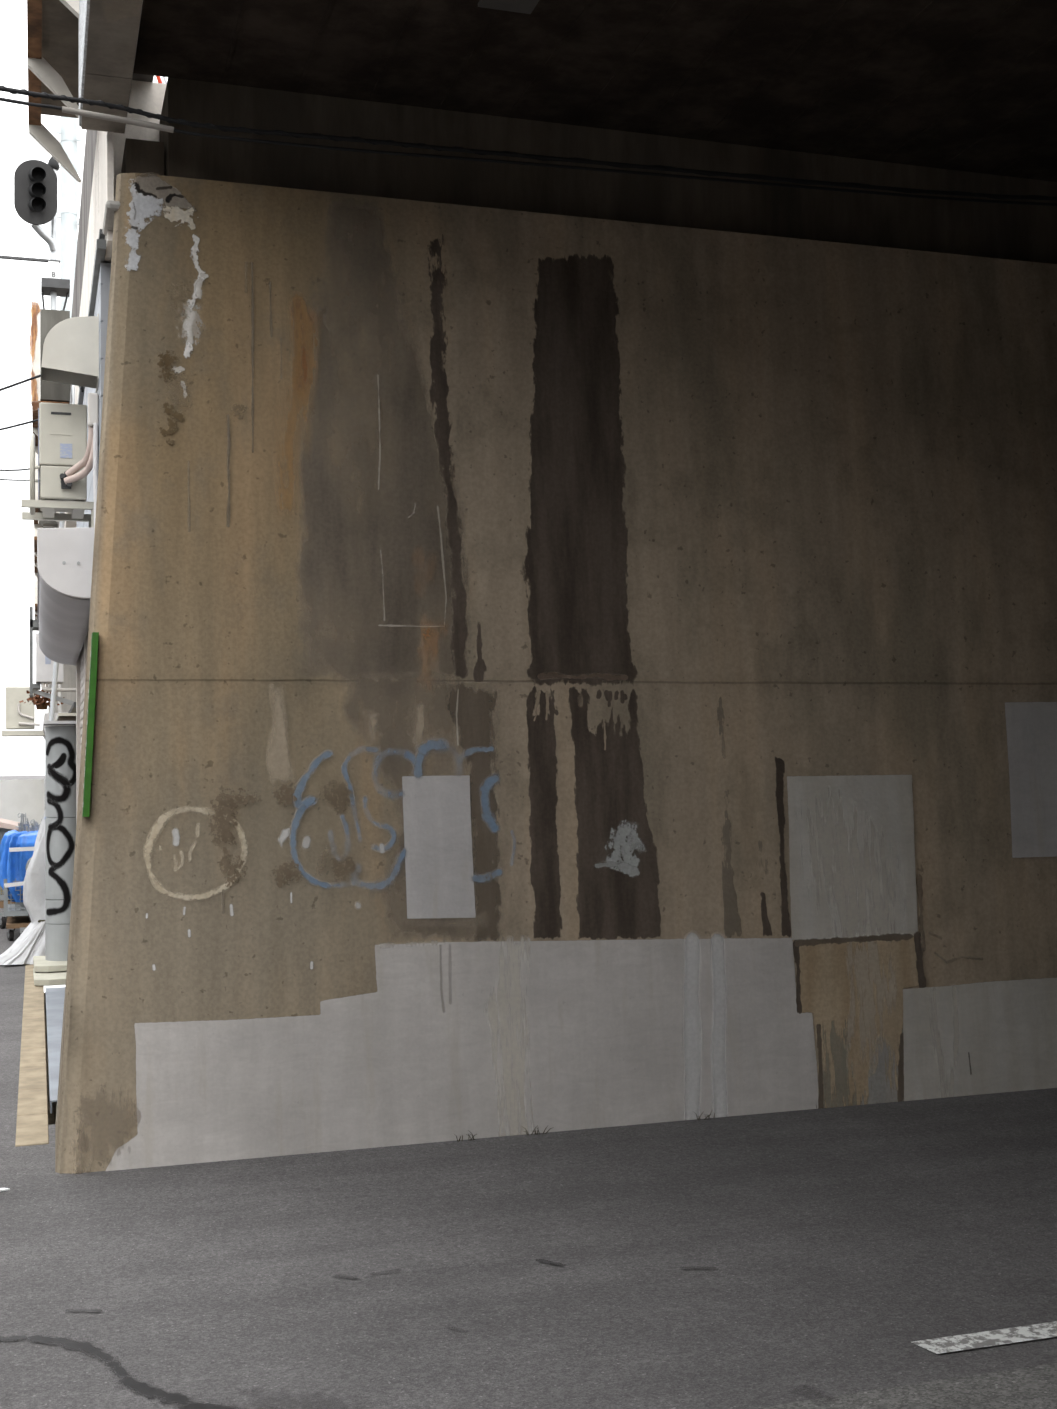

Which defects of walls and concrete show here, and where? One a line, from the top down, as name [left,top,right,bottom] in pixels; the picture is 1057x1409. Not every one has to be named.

water stain [523,254,661,940]